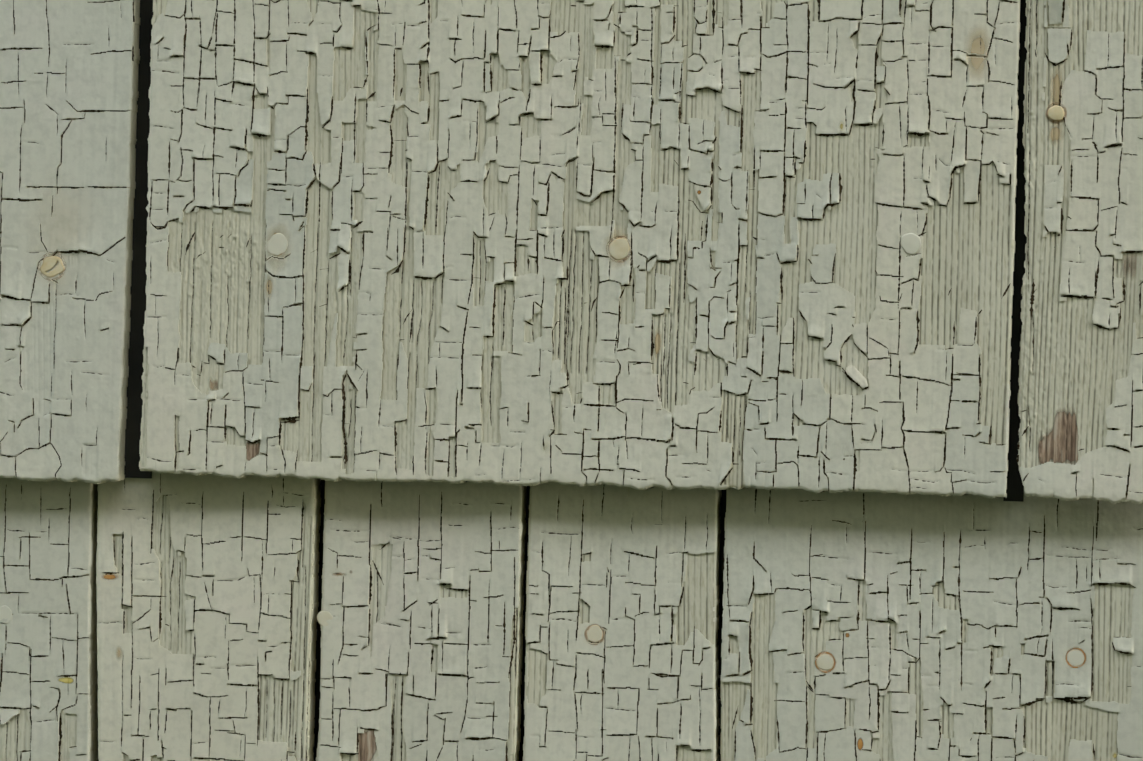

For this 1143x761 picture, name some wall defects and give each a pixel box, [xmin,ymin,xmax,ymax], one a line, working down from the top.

crack [0,0,135,761]
peeling [139,351,149,467]
peeling [167,6,380,474]
peeling [258,501,315,761]
peeling [380,50,461,477]
peeling [507,607,549,761]
peeling [473,0,762,490]
peeling [673,552,717,645]
peeling [761,0,819,79]
peeling [778,0,908,395]
peeling [856,581,924,761]
peeling [918,0,1143,468]